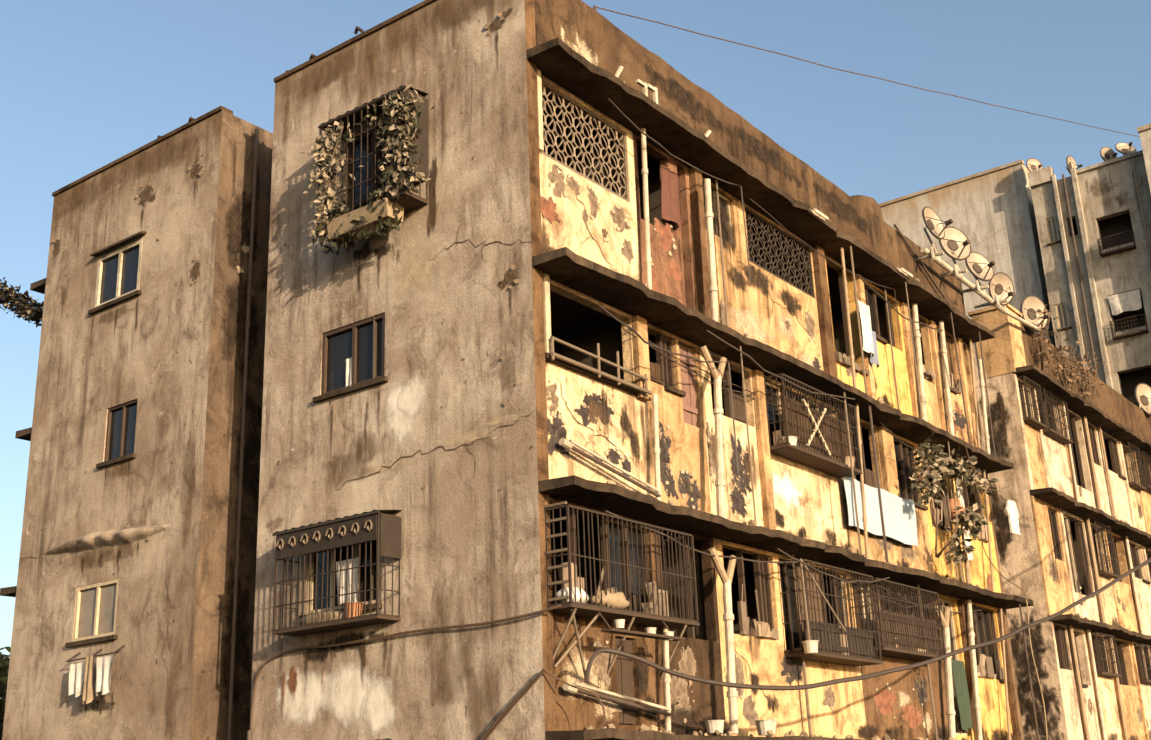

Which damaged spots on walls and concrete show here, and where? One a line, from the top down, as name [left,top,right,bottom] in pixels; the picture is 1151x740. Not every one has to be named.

crack [428,227,531,261]
leakage [541,225,555,254]
leakage [222,168,261,500]
crack [557,379,637,467]
crack [337,412,533,490]
corrosion [281,666,297,713]
peeling [824,685,835,711]
peeling [871,676,929,730]